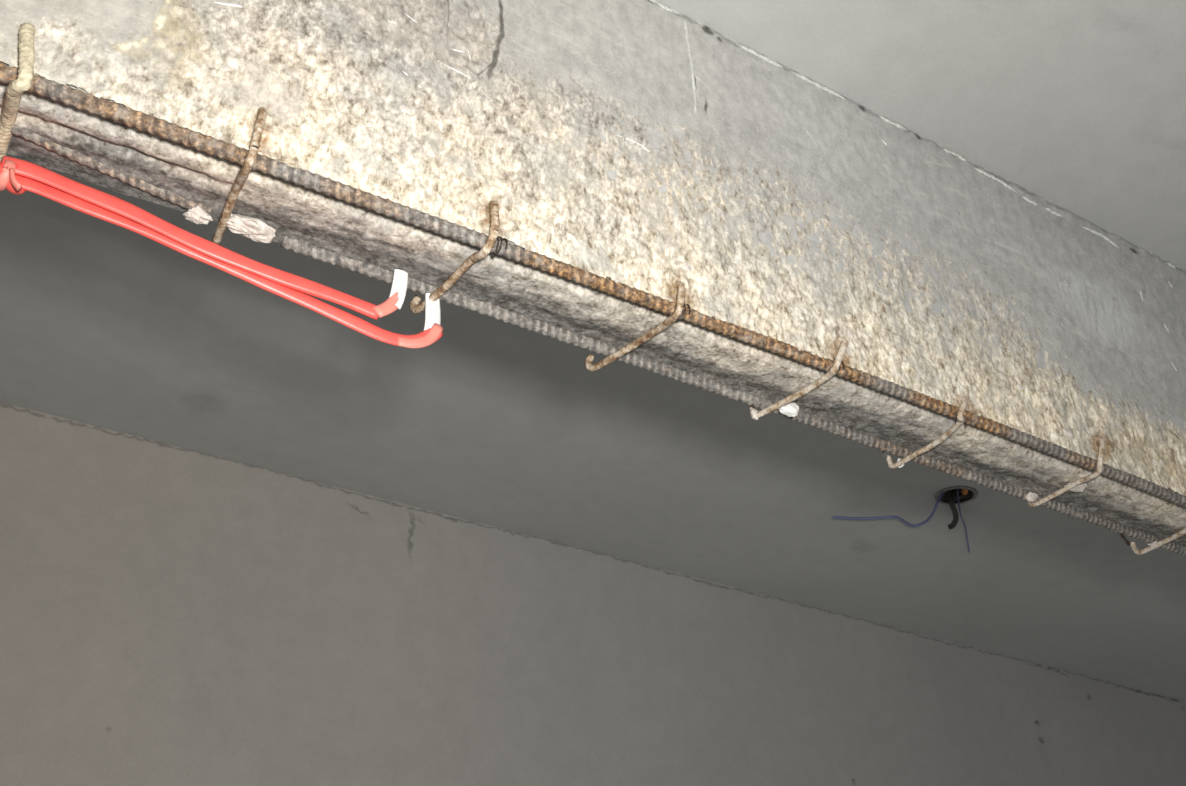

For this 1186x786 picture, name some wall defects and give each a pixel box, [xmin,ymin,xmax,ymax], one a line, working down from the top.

crack [478,2,504,75]
spalling [0,0,1186,556]